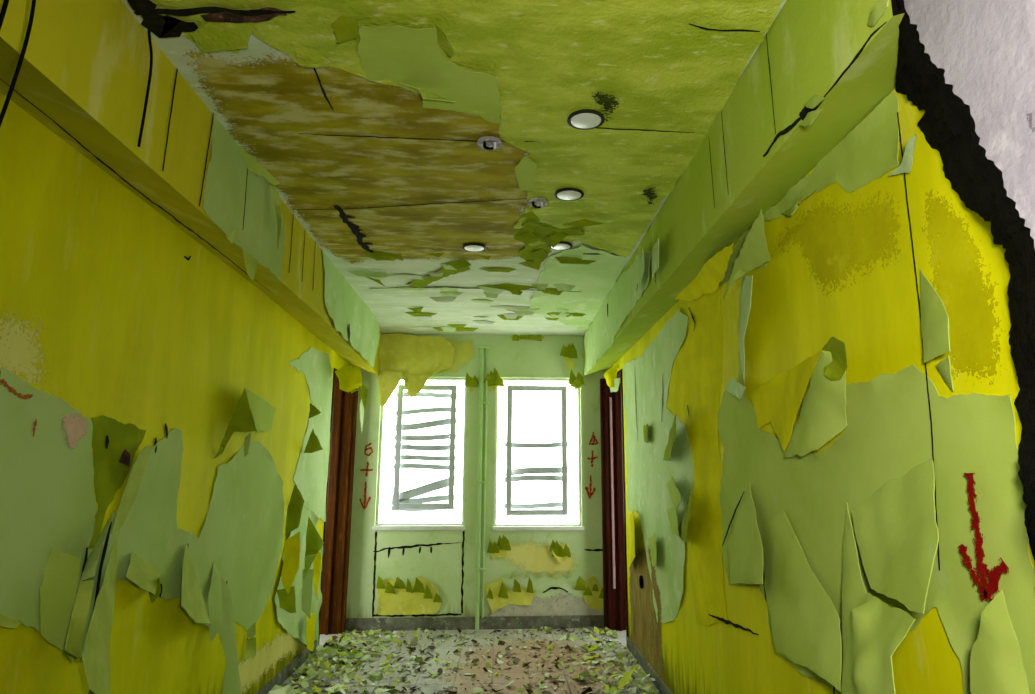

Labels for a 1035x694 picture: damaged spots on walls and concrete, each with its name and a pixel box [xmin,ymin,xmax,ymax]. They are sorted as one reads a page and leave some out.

crack [689,22,886,157]
peeling [0,0,783,694]
crack [289,198,526,286]
crack [370,284,480,292]
peeling [604,0,1035,694]